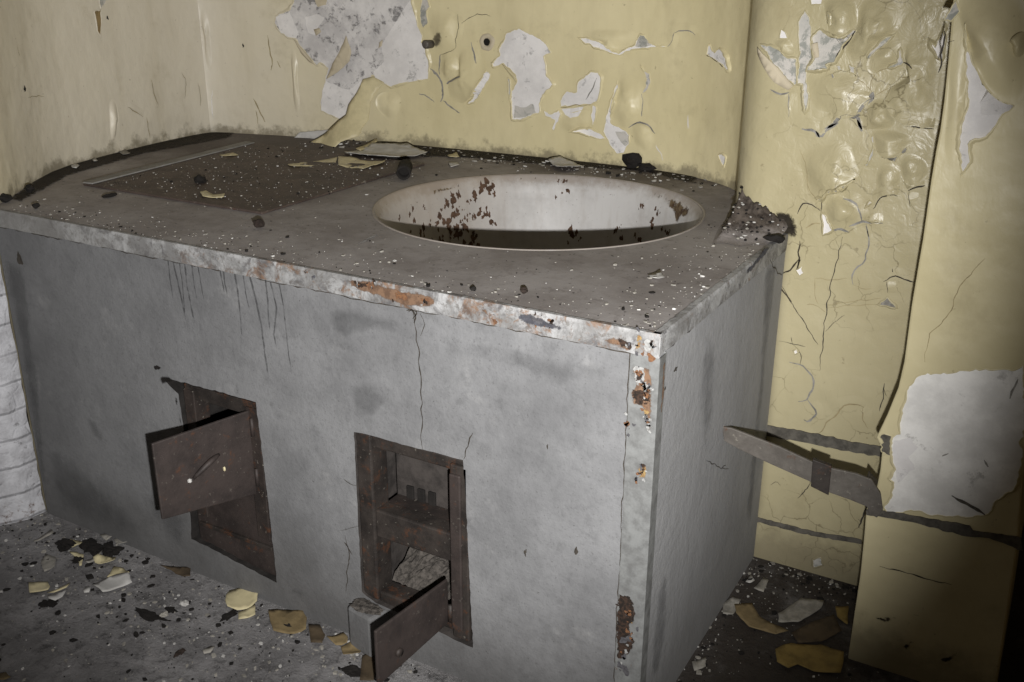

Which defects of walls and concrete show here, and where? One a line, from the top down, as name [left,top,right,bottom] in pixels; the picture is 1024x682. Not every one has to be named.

peeling [274,0,432,169]
peeling [467,28,631,154]
peeling [757,0,857,115]
peeling [927,0,1014,178]
water stain [220,271,285,371]
rust [351,279,434,307]
crack [406,309,425,451]
rust [607,327,665,437]
crack [767,67,936,434]
peeling [879,364,1024,519]
rust [616,595,639,676]